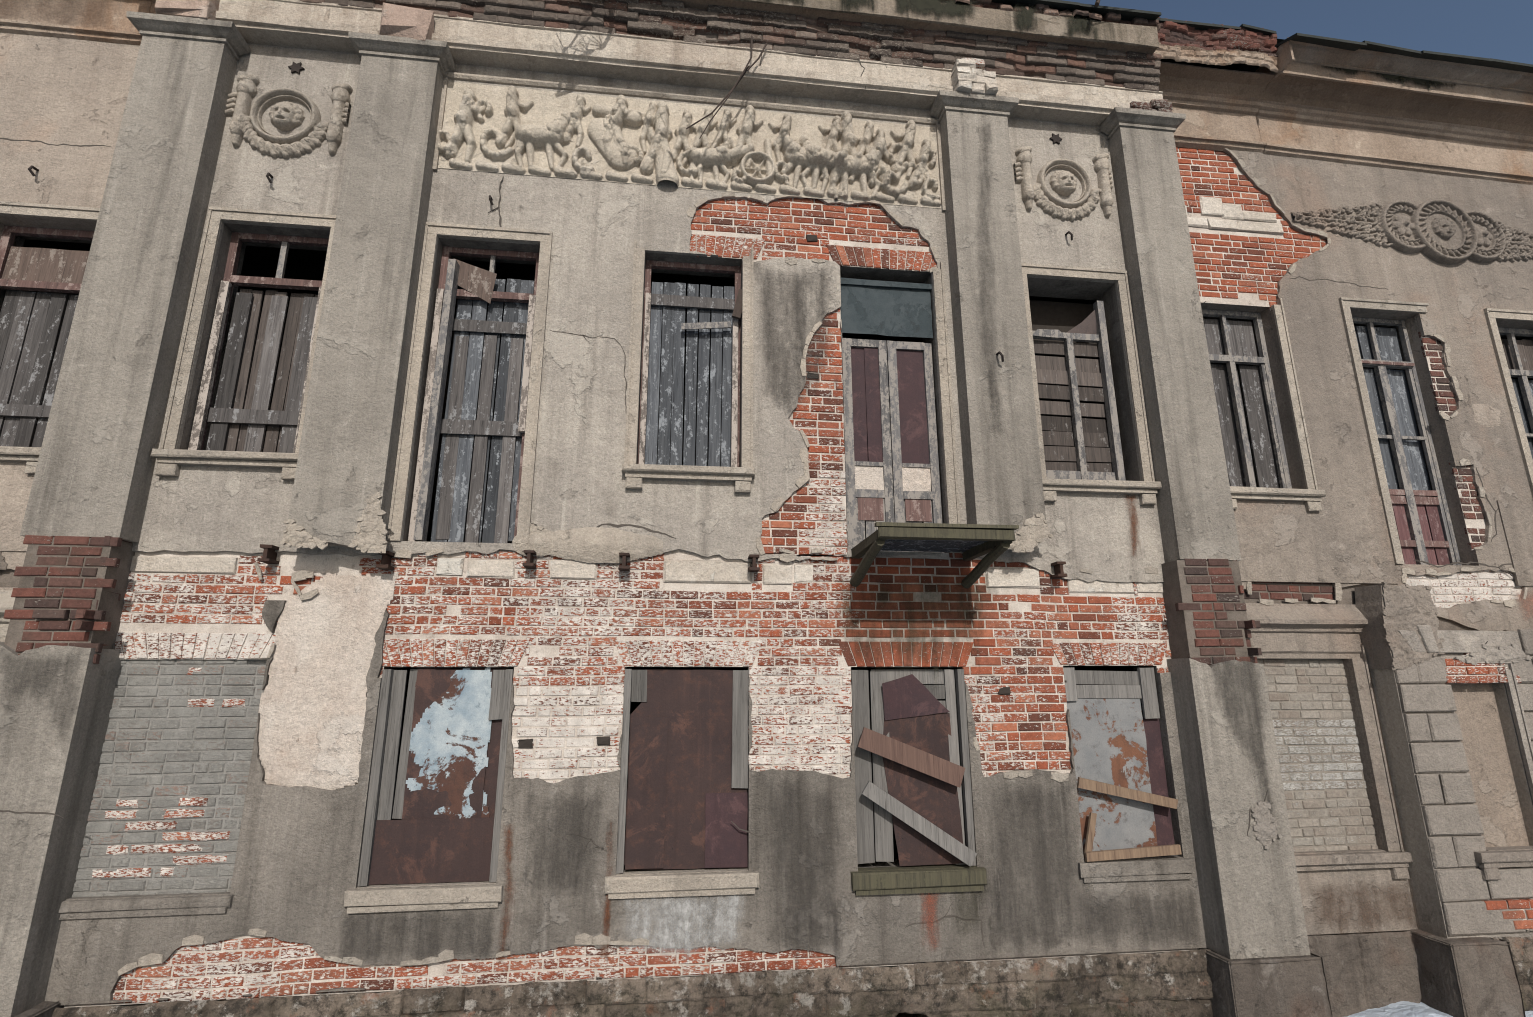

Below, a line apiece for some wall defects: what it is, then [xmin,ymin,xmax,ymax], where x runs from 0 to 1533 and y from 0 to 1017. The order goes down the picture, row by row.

flaking render [687,192,939,275]
flaking render [1176,147,1331,311]
flaking render [1418,332,1464,421]
flaking render [0,308,1343,819]
flaking render [1381,458,1532,684]
flaking render [108,928,847,1004]
leakage [635,895,738,949]
flaking render [1484,898,1533,930]